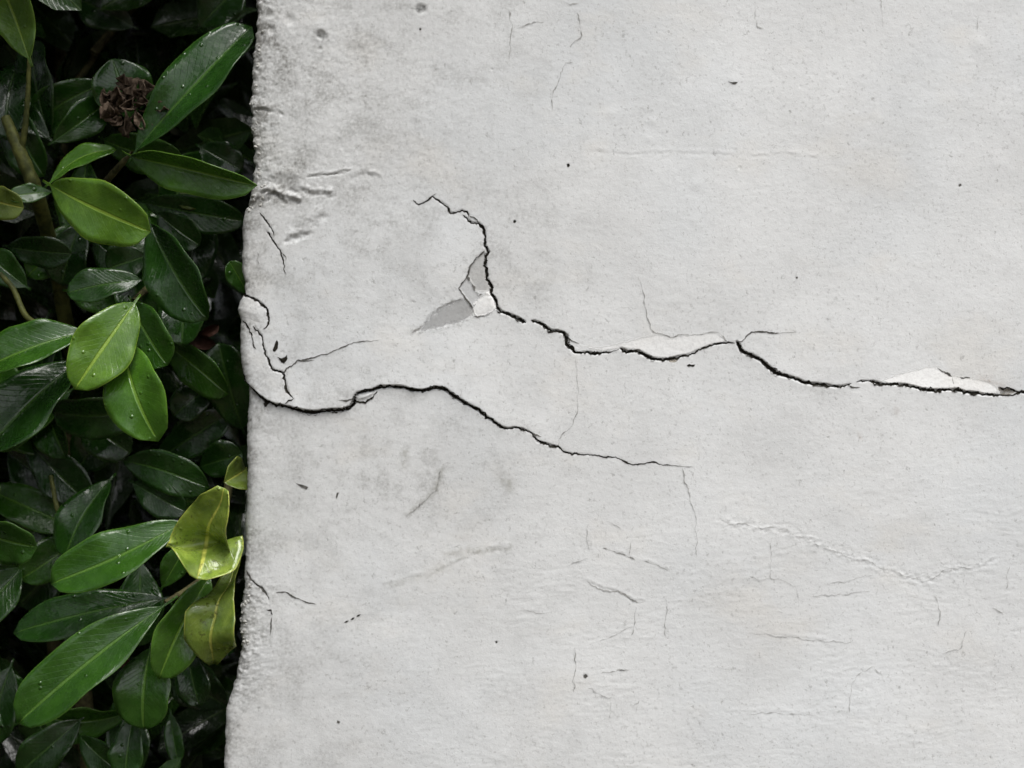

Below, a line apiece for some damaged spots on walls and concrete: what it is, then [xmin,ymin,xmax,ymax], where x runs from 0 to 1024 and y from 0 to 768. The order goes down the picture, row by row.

peeling [413,251,496,333]
crack [243,194,1024,555]
spalling [588,333,725,367]
spalling [884,367,1014,395]